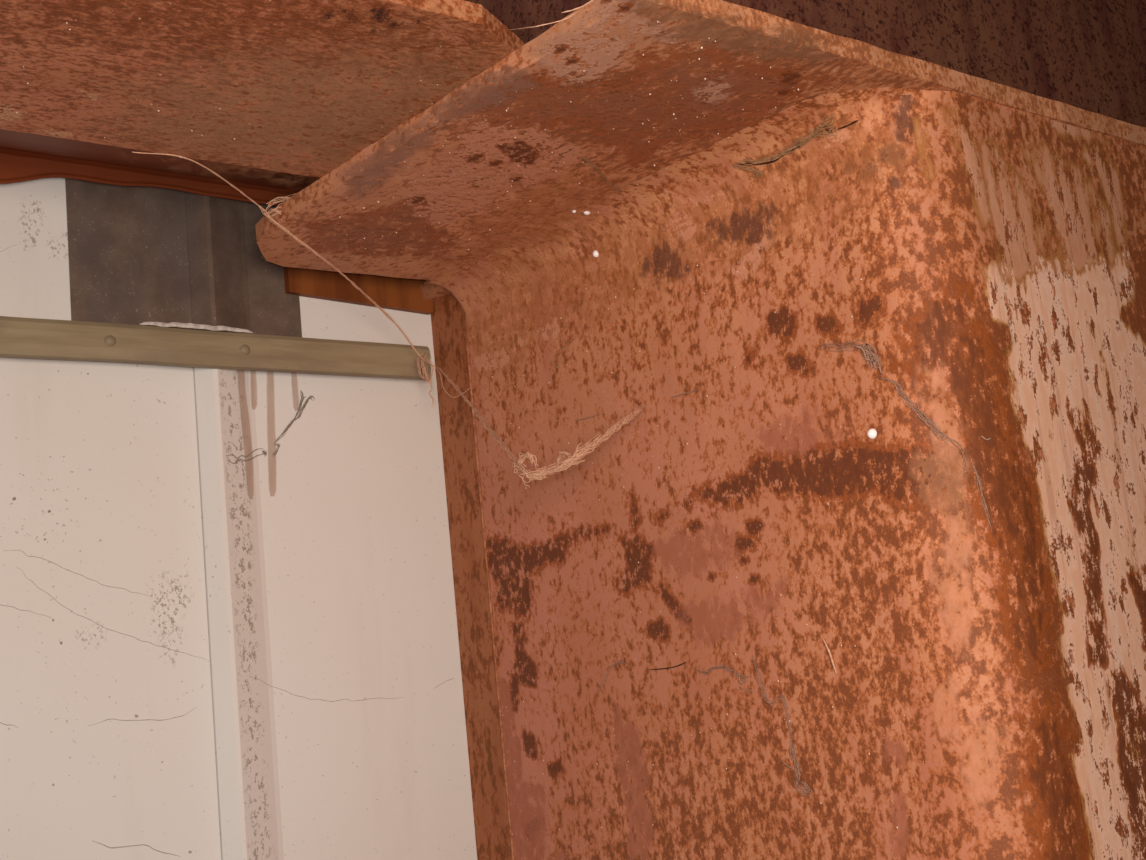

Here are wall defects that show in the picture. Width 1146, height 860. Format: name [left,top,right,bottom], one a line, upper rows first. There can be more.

corrosion [553,44,580,65]
corrosion [445,141,540,188]
corrosion [845,95,914,187]
corrosion [643,240,689,278]
corrosion [709,204,775,243]
leakage [238,370,276,498]
corrosion [486,274,1059,713]
peeling [926,105,1146,860]
leakage [157,582,184,627]
corrosion [1067,409,1146,860]
corrosion [522,729,565,780]
corrosion [1012,689,1093,860]